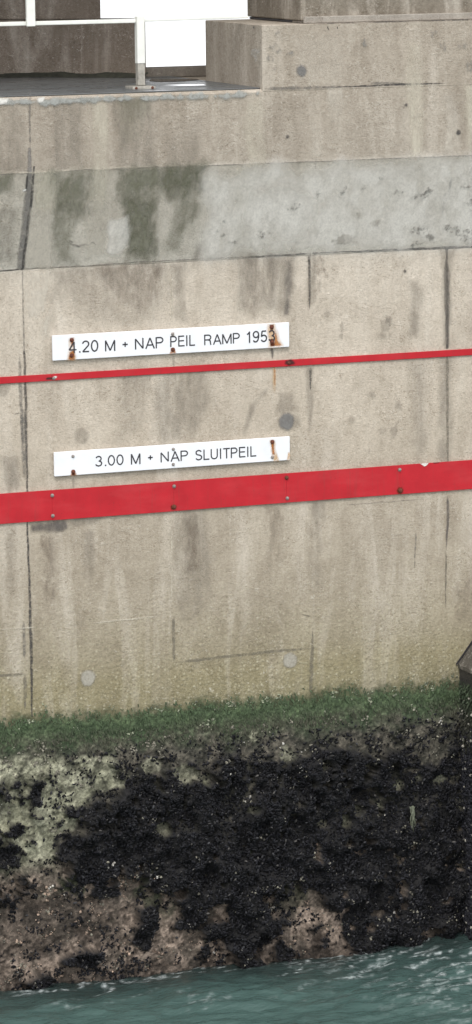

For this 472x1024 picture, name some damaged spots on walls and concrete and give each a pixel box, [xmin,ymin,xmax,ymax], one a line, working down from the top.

crack [0,138,125,286]
leakage [118,164,206,259]
crack [17,321,28,492]
crack [0,522,33,716]